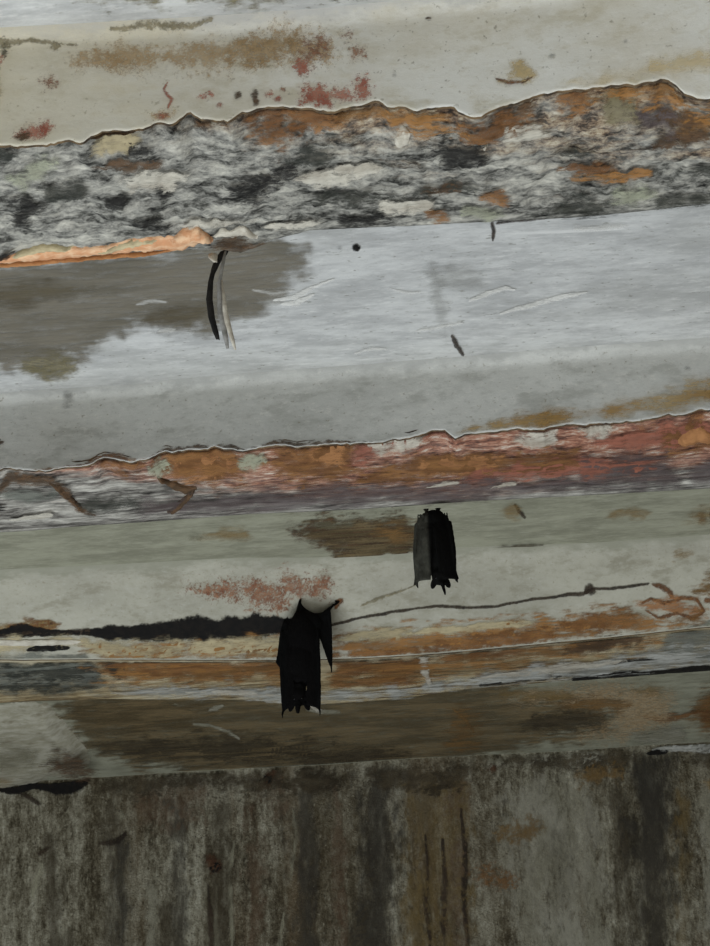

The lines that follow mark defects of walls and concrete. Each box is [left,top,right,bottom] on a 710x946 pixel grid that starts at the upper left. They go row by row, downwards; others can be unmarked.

corrosion [289,31,375,108]
peeling [496,60,536,84]
corrosion [14,120,54,141]
spalling [0,81,710,350]
leakage [0,239,314,382]
peeling [0,635,89,652]
corrosion [79,632,280,689]
crack [332,583,673,626]
corrosion [326,577,710,688]
leakage [351,774,402,946]
leakage [423,834,448,946]
leakage [460,807,470,946]